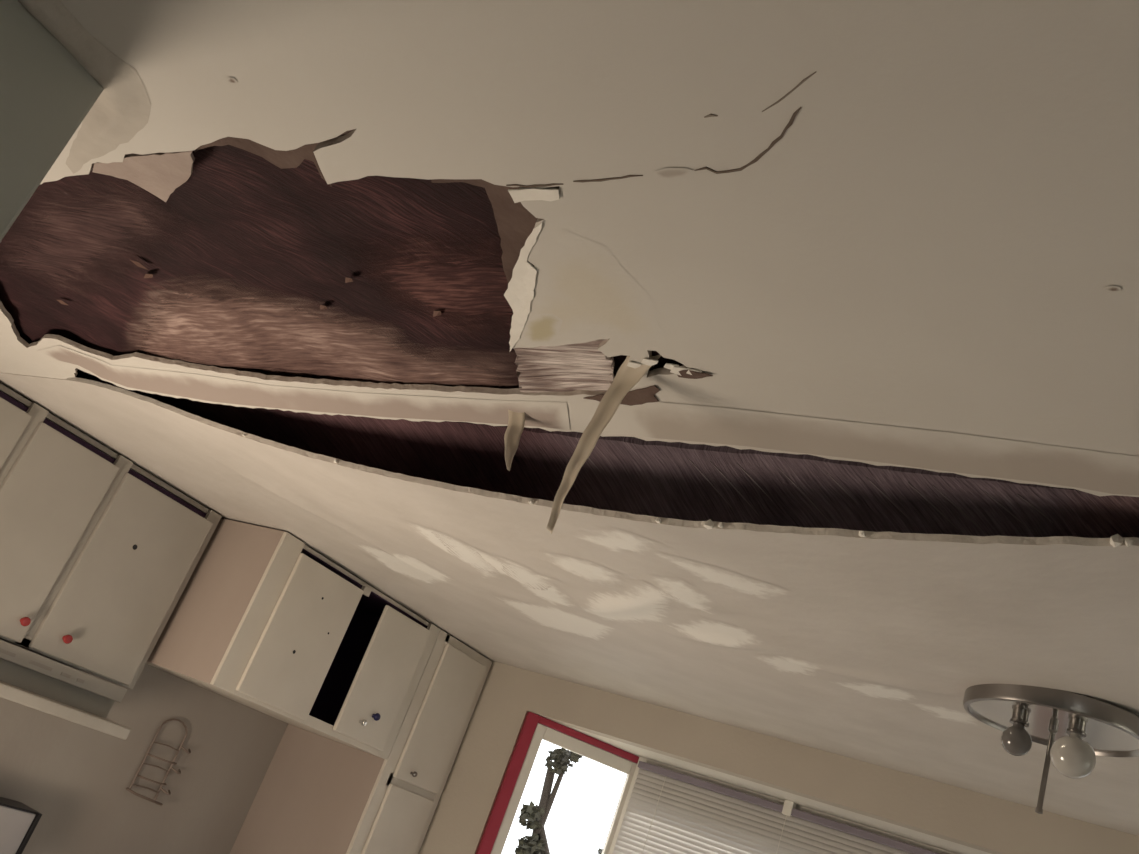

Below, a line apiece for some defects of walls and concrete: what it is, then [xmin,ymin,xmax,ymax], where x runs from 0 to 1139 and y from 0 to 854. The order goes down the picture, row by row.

crack [506,72,816,188]
flaking render [93,151,195,202]
peeling [627,358,702,376]